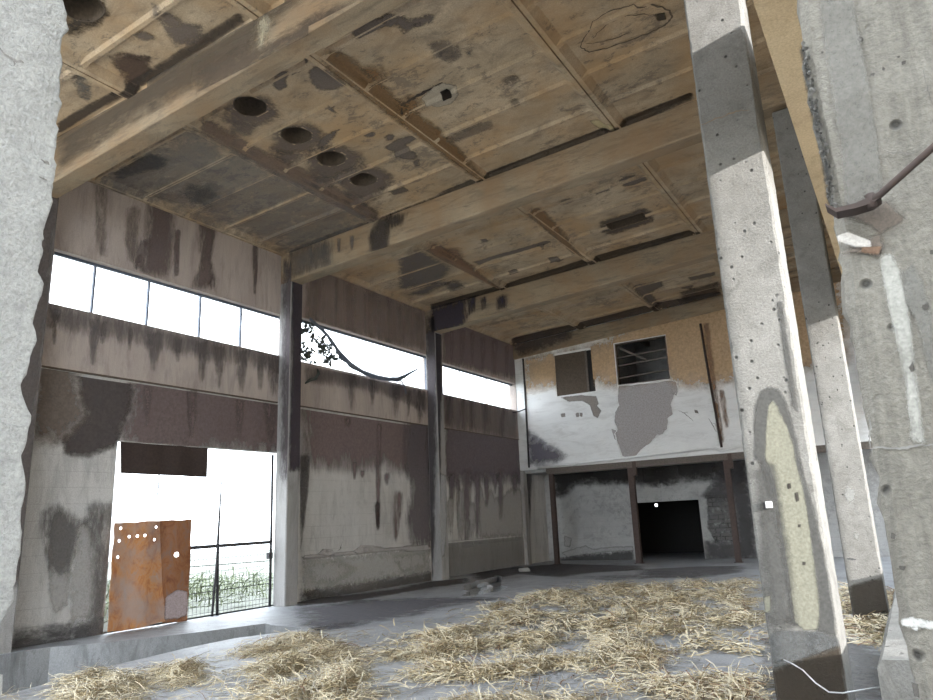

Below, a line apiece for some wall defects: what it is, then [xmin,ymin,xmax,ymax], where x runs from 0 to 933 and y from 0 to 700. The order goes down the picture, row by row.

spalling [421,83,458,107]
spalling [800,41,838,208]
leakage [126,205,180,276]
leakage [195,225,215,289]
leakage [63,376,132,457]
spalling [563,395,601,418]
peeling [612,379,679,460]
leakage [12,504,113,649]
leakage [300,455,310,542]
leakage [394,423,431,547]
leakage [298,470,738,631]
peeling [765,401,819,630]